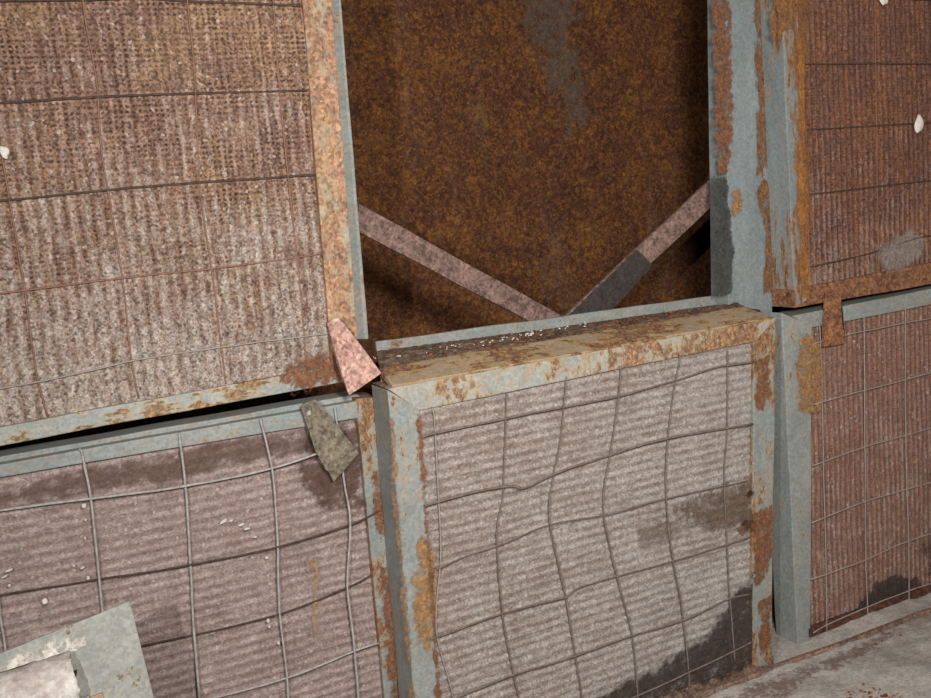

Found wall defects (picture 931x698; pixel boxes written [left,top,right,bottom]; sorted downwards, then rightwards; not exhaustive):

corrosion [711,0,734,175]
corrosion [754,0,810,297]
corrosion [731,189,743,216]
corrosion [280,353,342,389]
corrosion [755,356,771,411]
corrosion [797,334,823,414]
water stain [0,423,377,509]
water stain [854,538,931,612]
water stain [598,572,755,698]
corrosion [758,595,772,655]